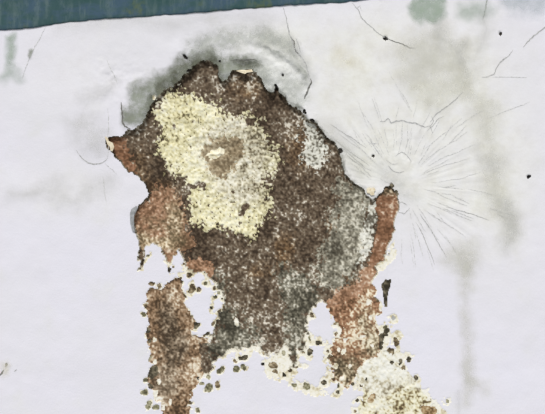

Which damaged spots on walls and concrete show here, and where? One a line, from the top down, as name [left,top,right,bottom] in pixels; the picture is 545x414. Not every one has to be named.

leakage [123,34,280,124]
crack [283,8,312,99]
crack [354,5,410,48]
crack [488,27,545,77]
crack [332,72,529,268]
flaking render [105,60,452,414]